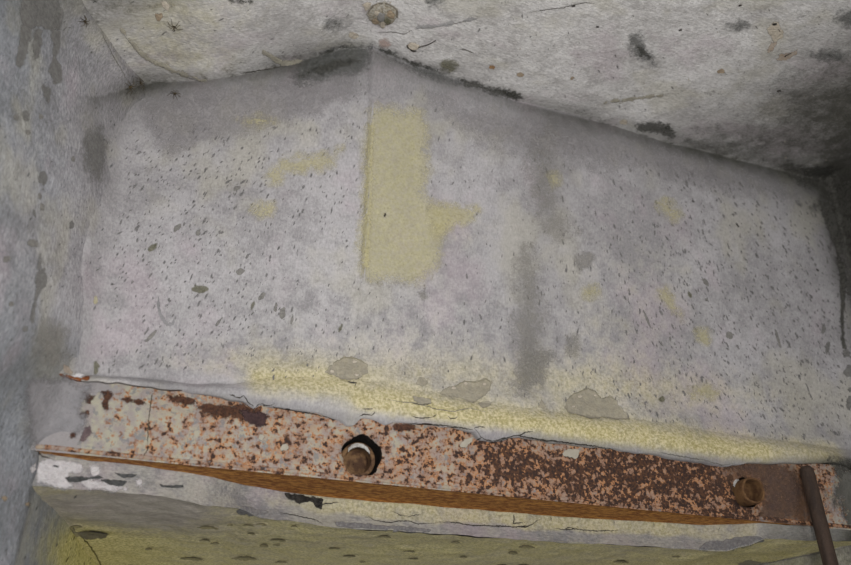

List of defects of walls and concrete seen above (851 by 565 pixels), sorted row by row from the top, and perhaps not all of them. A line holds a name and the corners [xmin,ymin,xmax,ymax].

water stain [16,0,64,103]
water stain [293,46,369,86]
water stain [379,49,522,100]
water stain [780,161,851,377]
rust [79,390,146,417]
rust [167,395,270,427]
rust [394,423,415,432]
crack [391,400,611,449]
spalling [565,378,678,422]
peeling [563,449,580,459]
spalling [66,473,137,491]
rust [725,464,804,519]